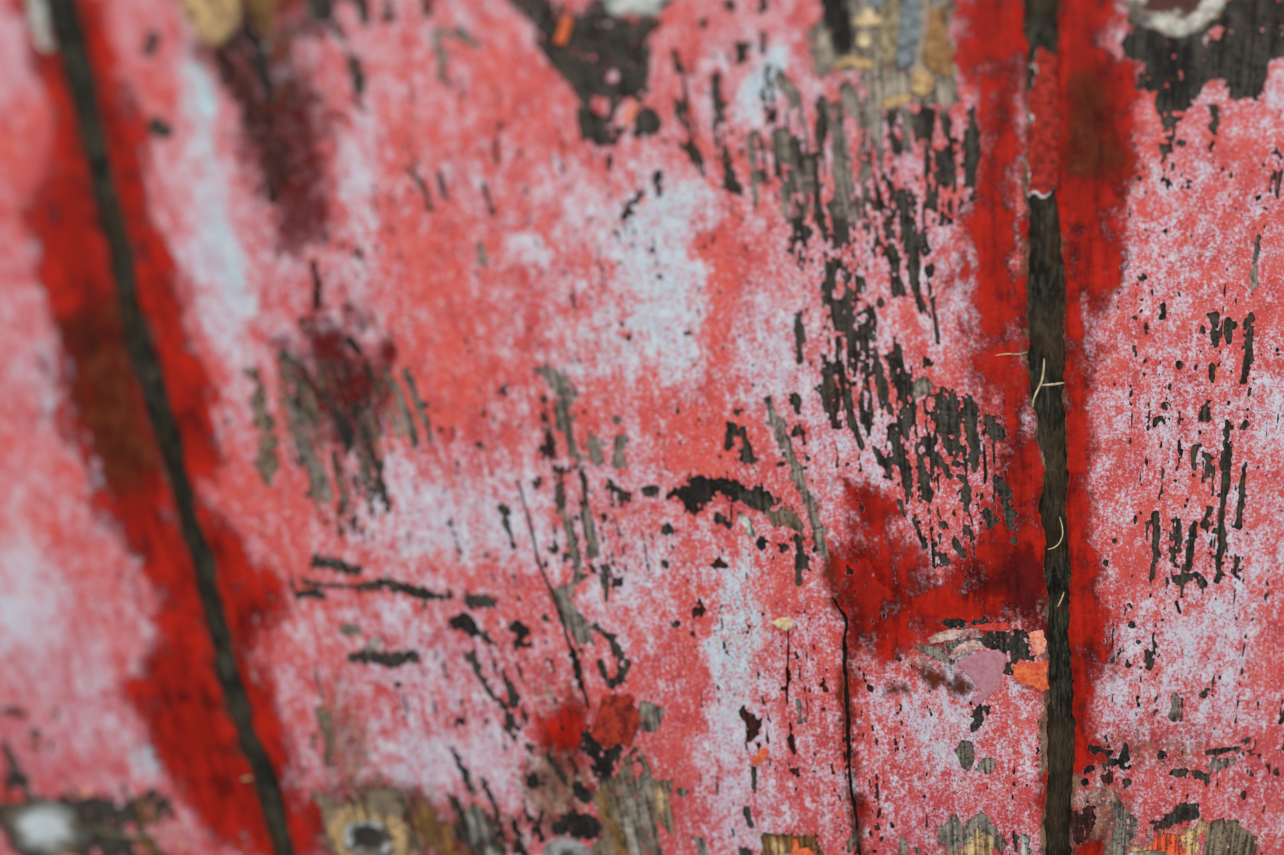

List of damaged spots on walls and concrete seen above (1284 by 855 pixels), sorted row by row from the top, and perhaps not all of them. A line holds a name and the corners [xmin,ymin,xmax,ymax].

peeling [241,0,1041,855]
peeling [1103,0,1284,723]
peeling [0,705,53,754]
peeling [0,740,182,855]
crack [831,596,862,855]
peeling [1070,699,1284,855]